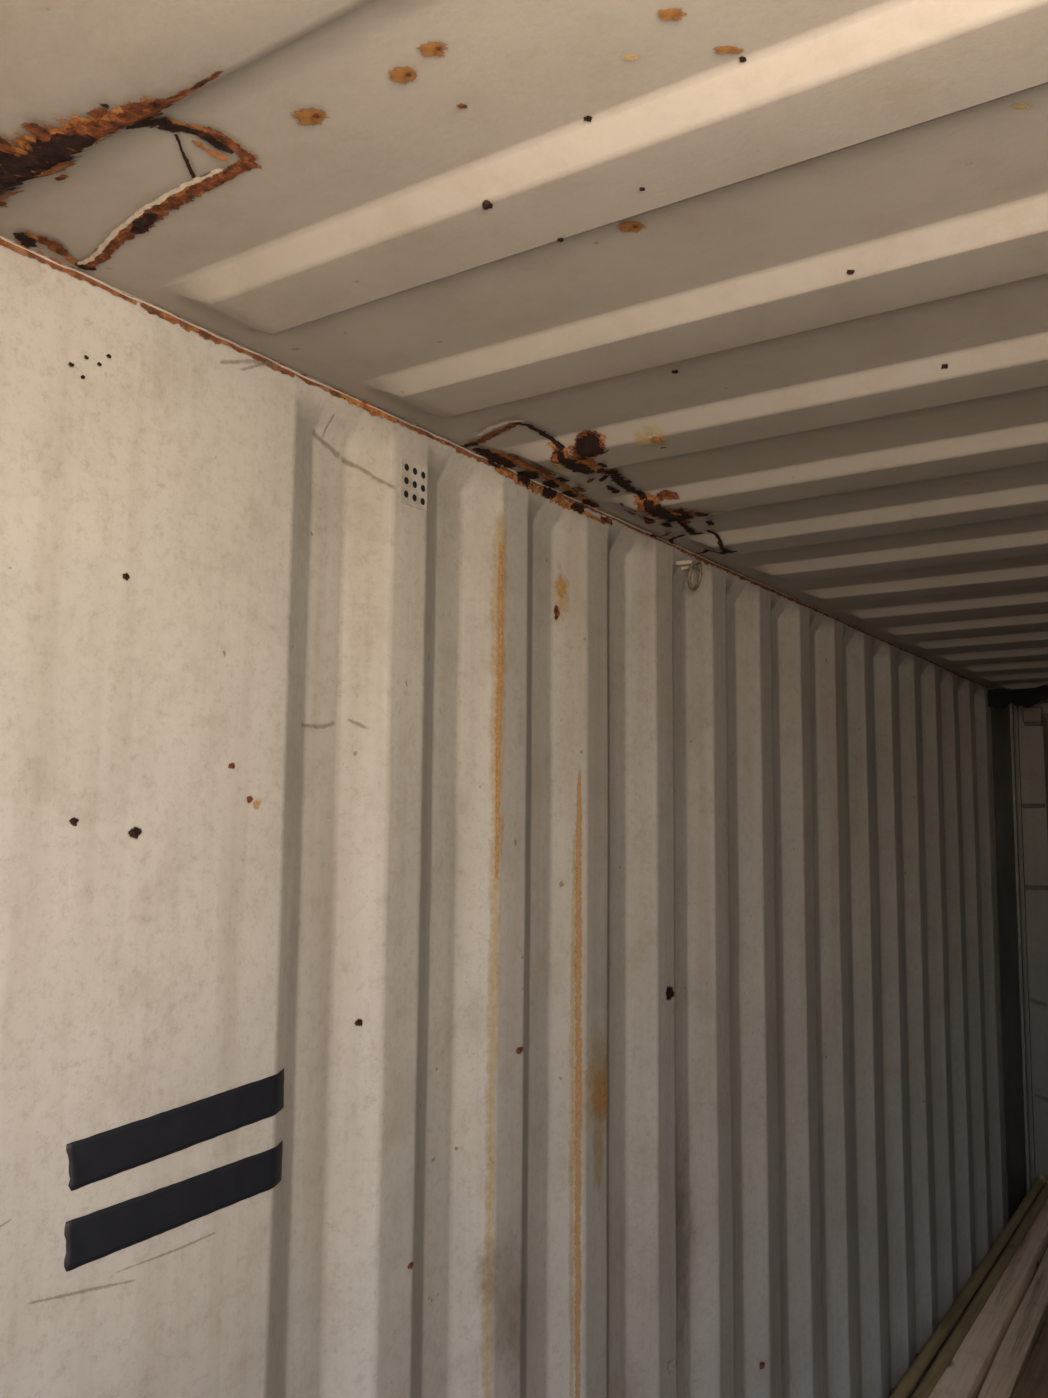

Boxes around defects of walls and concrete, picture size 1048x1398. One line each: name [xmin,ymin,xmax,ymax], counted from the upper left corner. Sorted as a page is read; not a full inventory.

corrosion [658,8,687,21]
corrosion [417,42,447,57]
corrosion [389,66,417,84]
corrosion [292,108,328,126]
corrosion [0,71,223,207]
corrosion [618,221,645,233]
corrosion [0,232,988,688]
corrosion [495,546,503,877]
corrosion [574,774,608,1398]